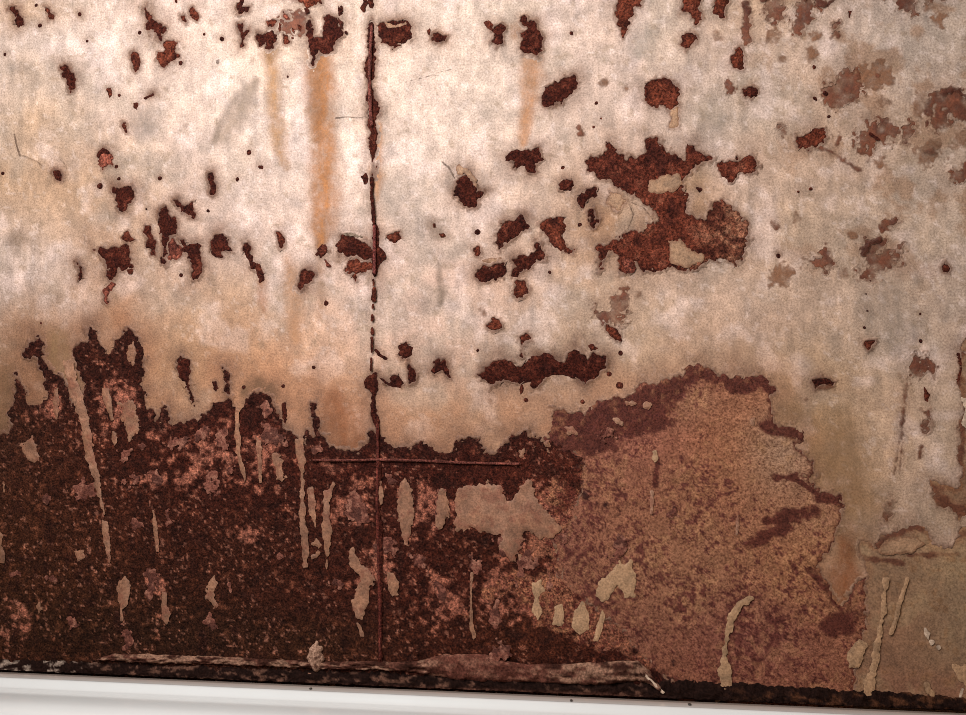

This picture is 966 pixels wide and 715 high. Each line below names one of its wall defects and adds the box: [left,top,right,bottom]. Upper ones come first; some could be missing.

peeling [540,72,582,110]
peeling [48,166,67,185]
peeling [118,118,131,139]
peeling [444,164,489,213]
peeling [505,143,546,178]
peeling [556,73,763,278]
peeling [71,145,267,308]
peeling [272,229,289,253]
peeling [292,225,405,295]
peeling [469,213,578,302]
peeling [769,213,909,295]
peeling [0,286,966,713]